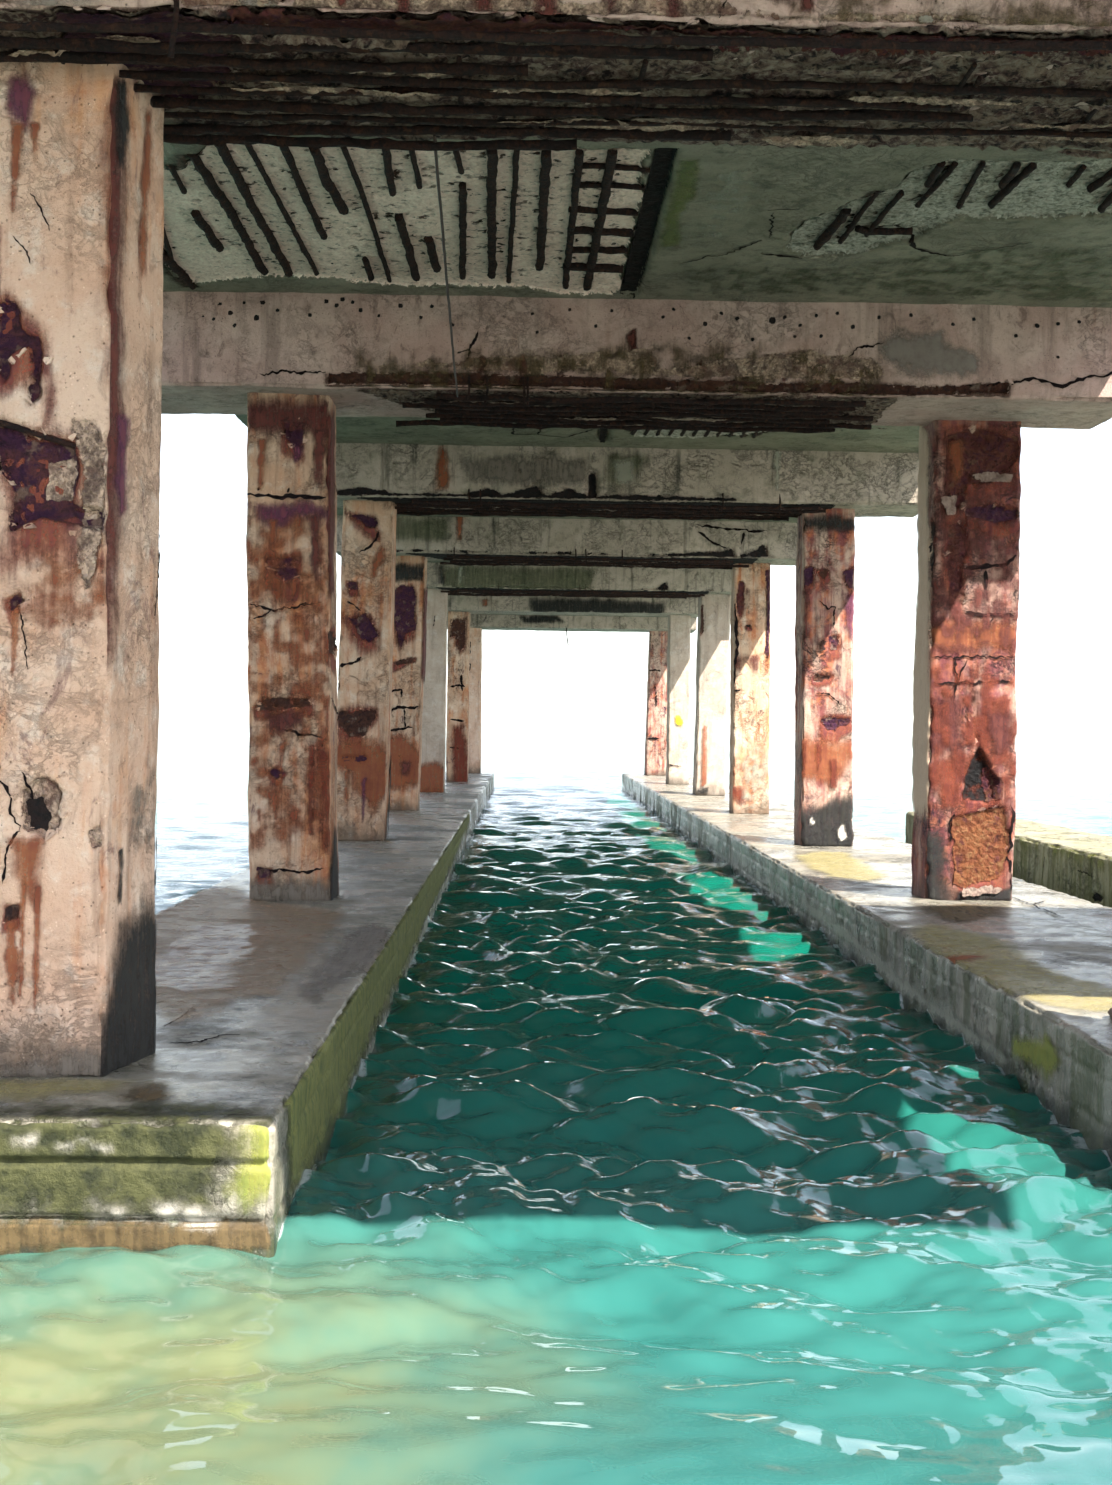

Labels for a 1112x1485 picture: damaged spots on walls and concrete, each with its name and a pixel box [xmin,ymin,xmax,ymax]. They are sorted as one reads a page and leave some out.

spalling [0,0,1112,319]
spalling [0,294,107,589]
corrosion [11,79,196,673]
spalling [325,311,1014,439]
crack [969,371,1112,389]
crack [19,609,28,669]
corrosion [246,398,468,851]
crack [0,767,34,884]
corrosion [2,837,45,1008]
leakage [0,837,268,1077]
leakage [0,1082,276,1143]
leakage [159,1206,219,1227]